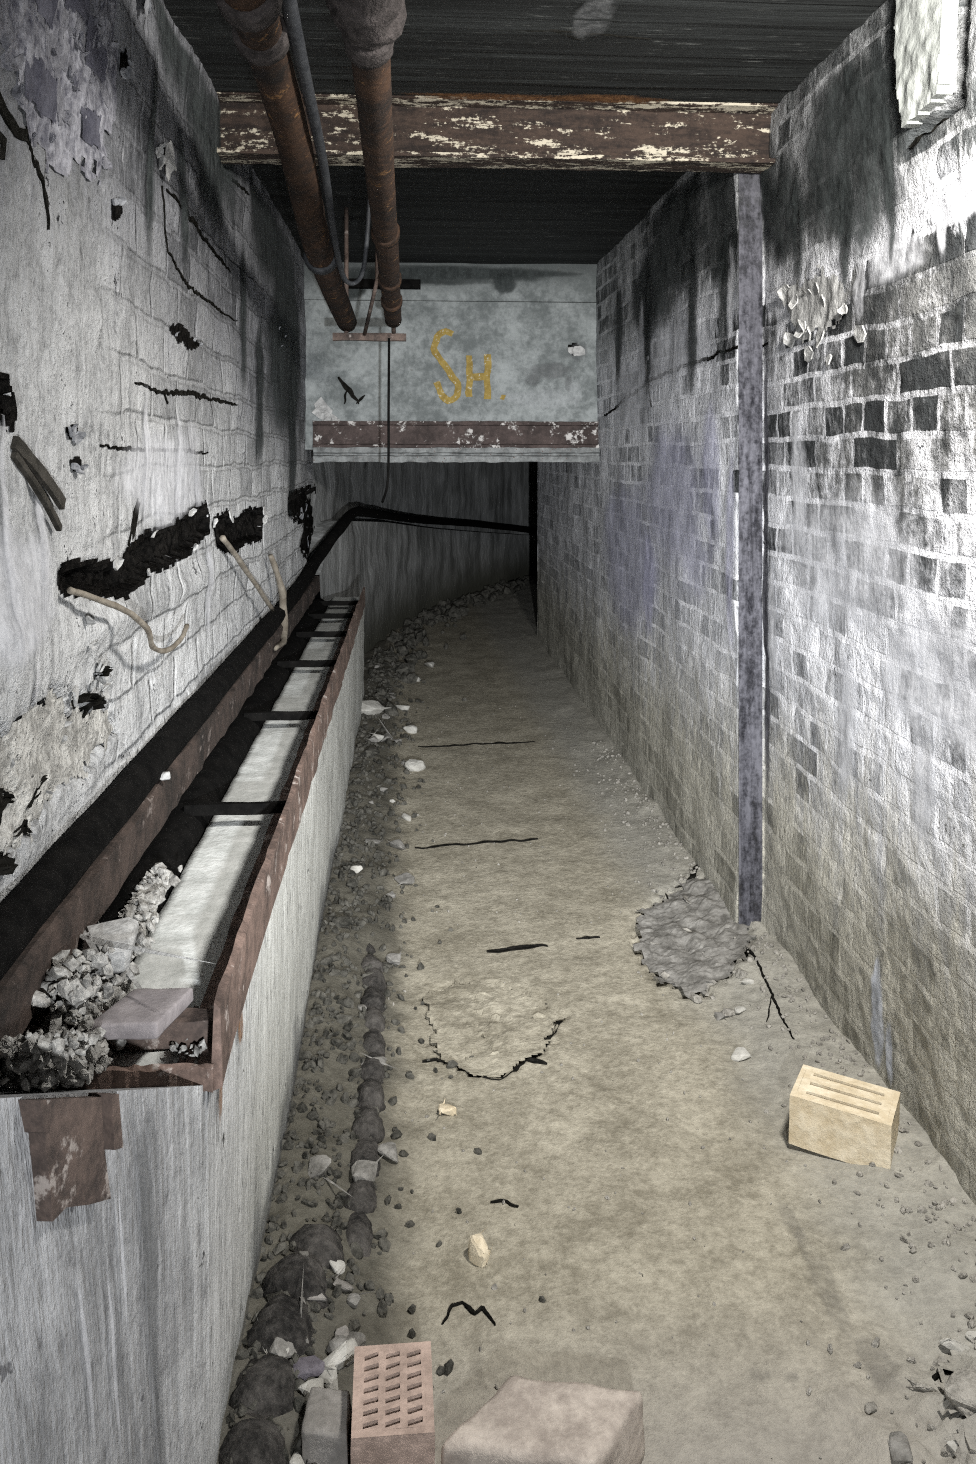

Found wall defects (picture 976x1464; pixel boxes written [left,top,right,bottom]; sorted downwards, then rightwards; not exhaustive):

leakage [839,114,919,315]
leakage [937,178,972,247]
spalling [0,500,269,876]
crack [662,865,698,903]
crack [744,947,795,1040]
crack [422,1020,563,1081]